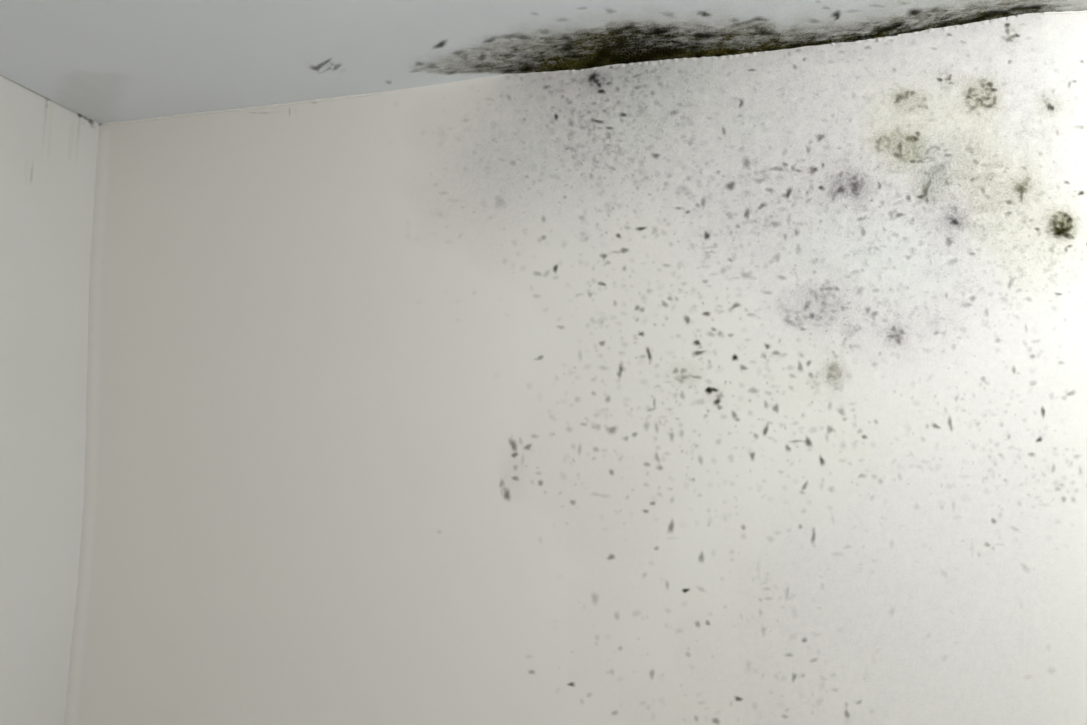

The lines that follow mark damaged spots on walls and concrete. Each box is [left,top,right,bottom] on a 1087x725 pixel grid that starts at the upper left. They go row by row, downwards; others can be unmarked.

leakage [445,0,1065,92]
leakage [1053,214,1072,237]